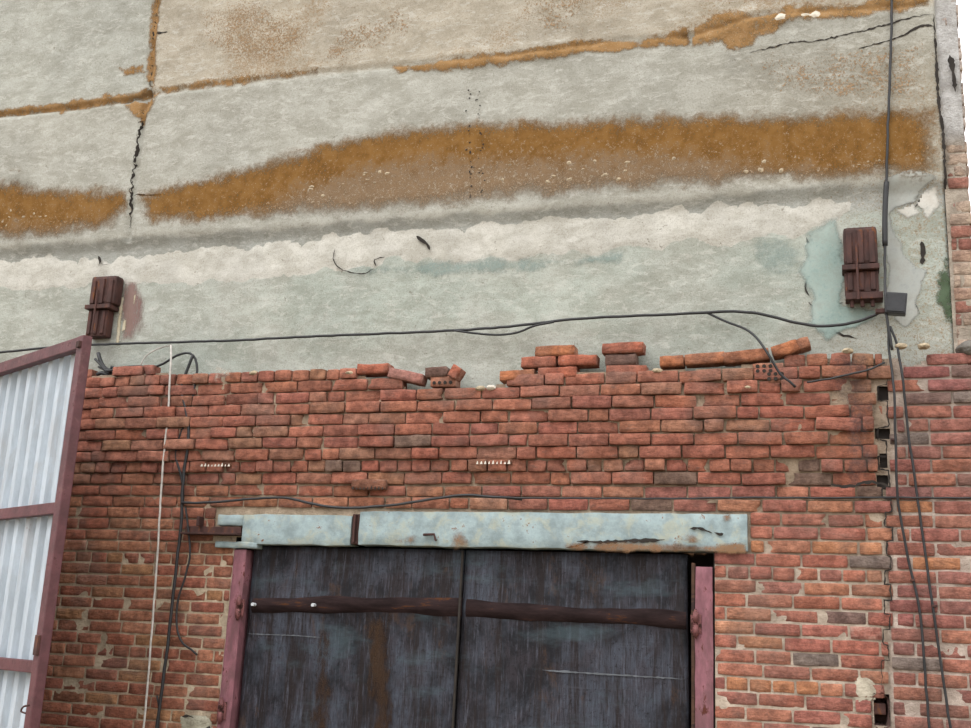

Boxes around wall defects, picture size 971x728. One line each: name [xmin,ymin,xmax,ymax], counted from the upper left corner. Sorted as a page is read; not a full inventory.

damp [394,0,928,73]
damp [0,181,128,239]
crack [129,113,161,227]
damp [141,108,937,223]
crack [749,14,957,243]
spalling [886,170,939,327]
rust [569,536,745,553]
spalling [180,714,213,728]